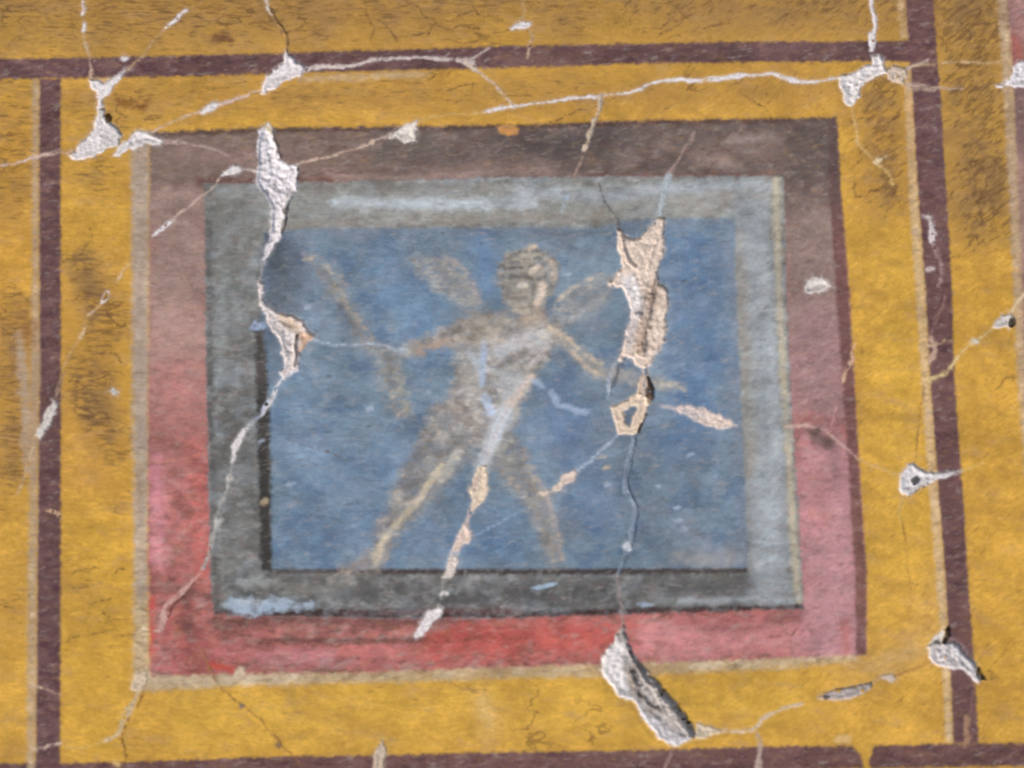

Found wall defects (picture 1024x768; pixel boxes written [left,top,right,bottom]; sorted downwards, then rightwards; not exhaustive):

crack [13,227,135,498]
flaking render [0,64,232,170]
crack [149,162,257,241]
flaking render [247,120,411,383]
flaking render [257,0,519,112]
crack [294,65,838,232]
flaking render [604,214,739,438]
flaking render [835,0,1024,188]
crack [918,156,1024,387]
crack [60,362,301,645]
crack [199,344,641,768]
flaking render [595,621,988,768]